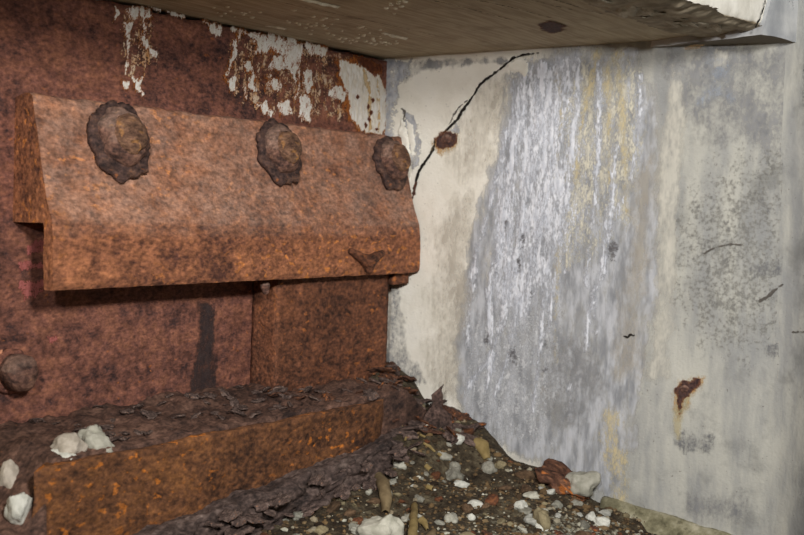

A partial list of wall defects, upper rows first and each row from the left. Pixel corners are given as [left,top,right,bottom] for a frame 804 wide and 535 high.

spalling [584,0,762,38]
corrosion [434,123,460,156]
crack [412,52,539,200]
leakage [439,46,785,501]
crack [759,284,783,302]
corrosion [171,385,330,419]
corrosion [674,377,704,433]
corrosion [73,424,153,443]
corrosion [132,430,410,535]